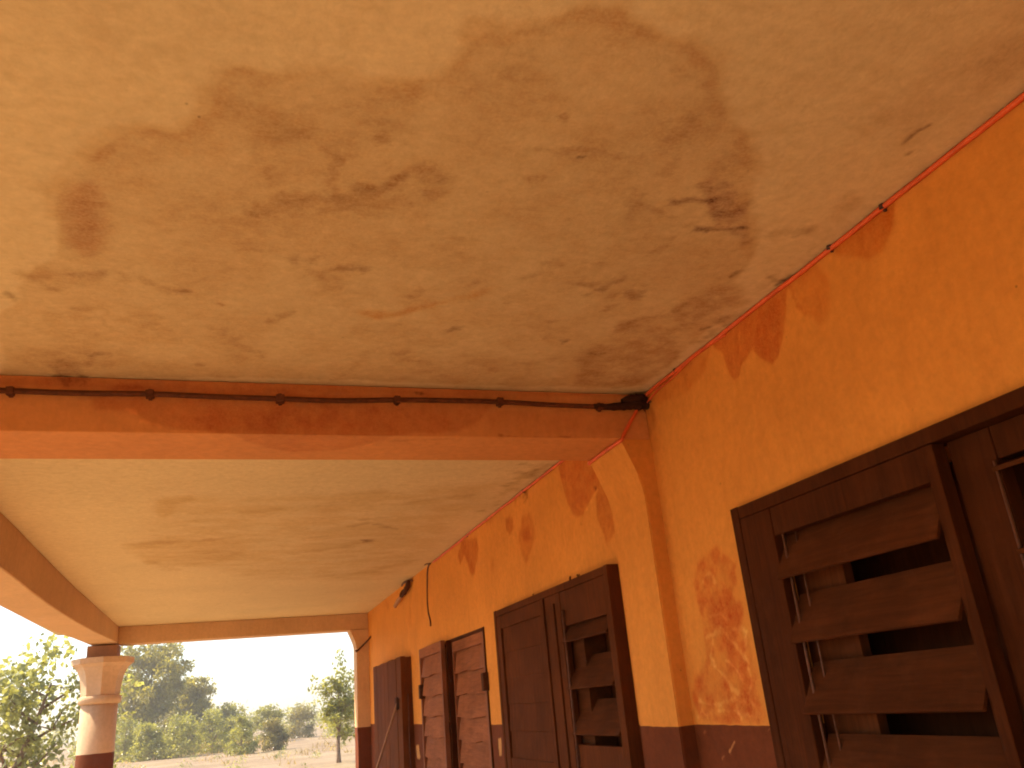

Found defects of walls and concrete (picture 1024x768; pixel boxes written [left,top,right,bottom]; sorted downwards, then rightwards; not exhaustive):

damp [0,0,900,453]
damp [115,460,615,582]